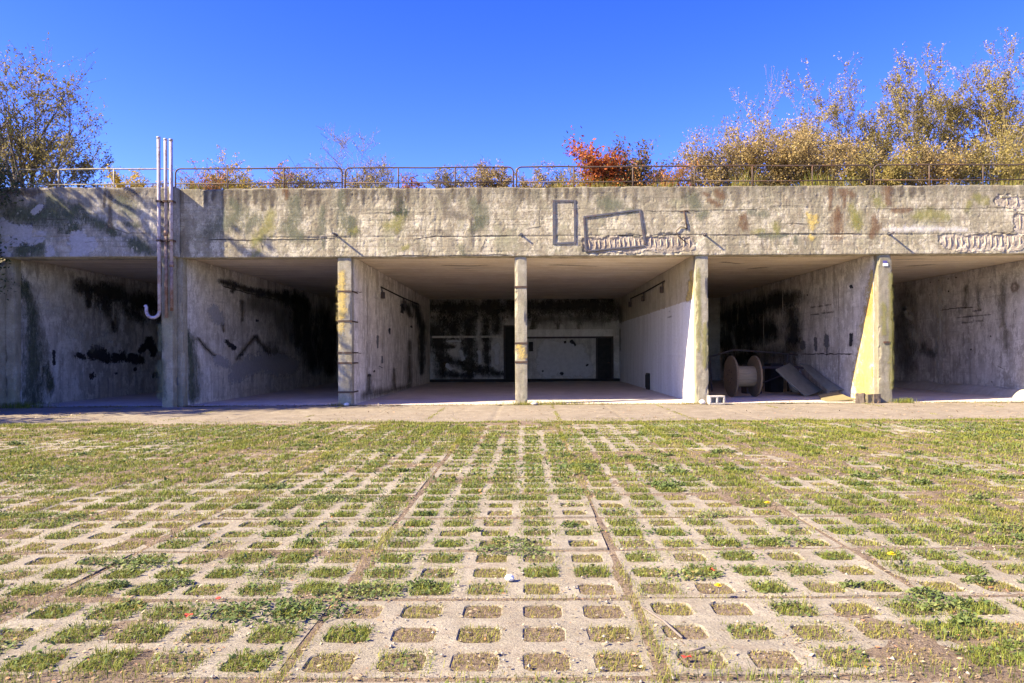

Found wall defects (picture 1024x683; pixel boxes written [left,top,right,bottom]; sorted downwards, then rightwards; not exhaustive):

damp [81,189,141,237]
spalling [583,210,695,254]
corrosion [829,188,854,238]
spalling [939,194,1024,253]
damp [237,335,272,360]